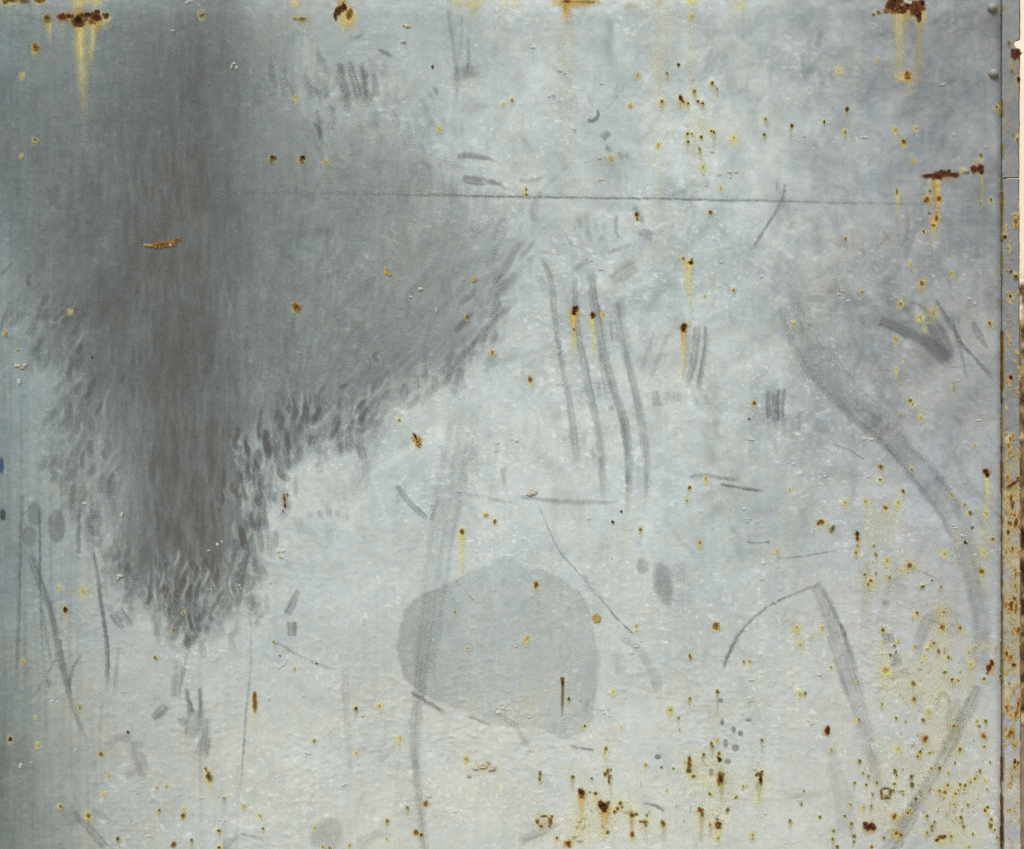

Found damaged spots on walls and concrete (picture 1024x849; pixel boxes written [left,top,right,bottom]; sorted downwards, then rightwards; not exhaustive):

rust [43,10,110,58]
rust [559,0,599,13]
rust [872,0,926,42]
rust [921,153,984,233]
rust [930,173,1021,848]
water stain [98,586,110,673]
rust [914,641,973,684]
rust [660,738,725,796]
rust [571,768,648,837]
rust [697,785,744,840]
rust [843,759,918,849]